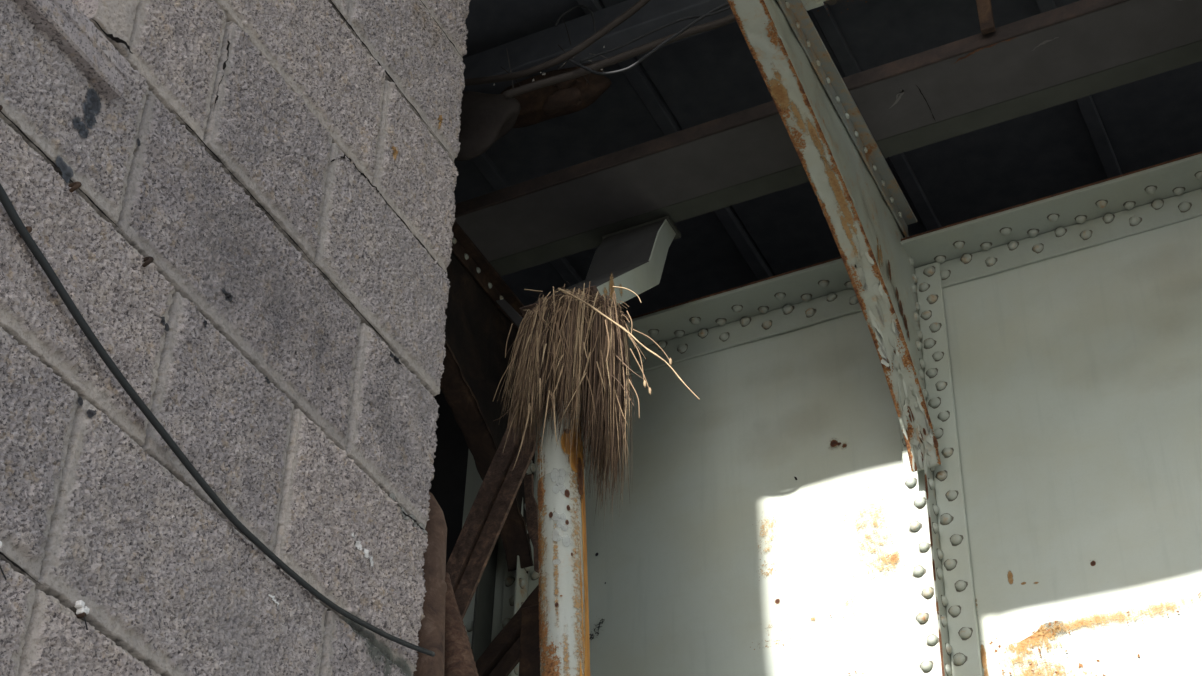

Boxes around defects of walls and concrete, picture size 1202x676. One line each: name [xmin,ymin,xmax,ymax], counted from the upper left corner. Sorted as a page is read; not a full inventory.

crack [213,34,230,112]
corrosion [727,0,941,499]
peeling [853,235,938,471]
corrosion [537,418,591,676]
corrosion [830,487,905,618]
corrosion [928,516,936,581]
corrosion [936,600,945,676]
corrosion [981,592,1201,676]